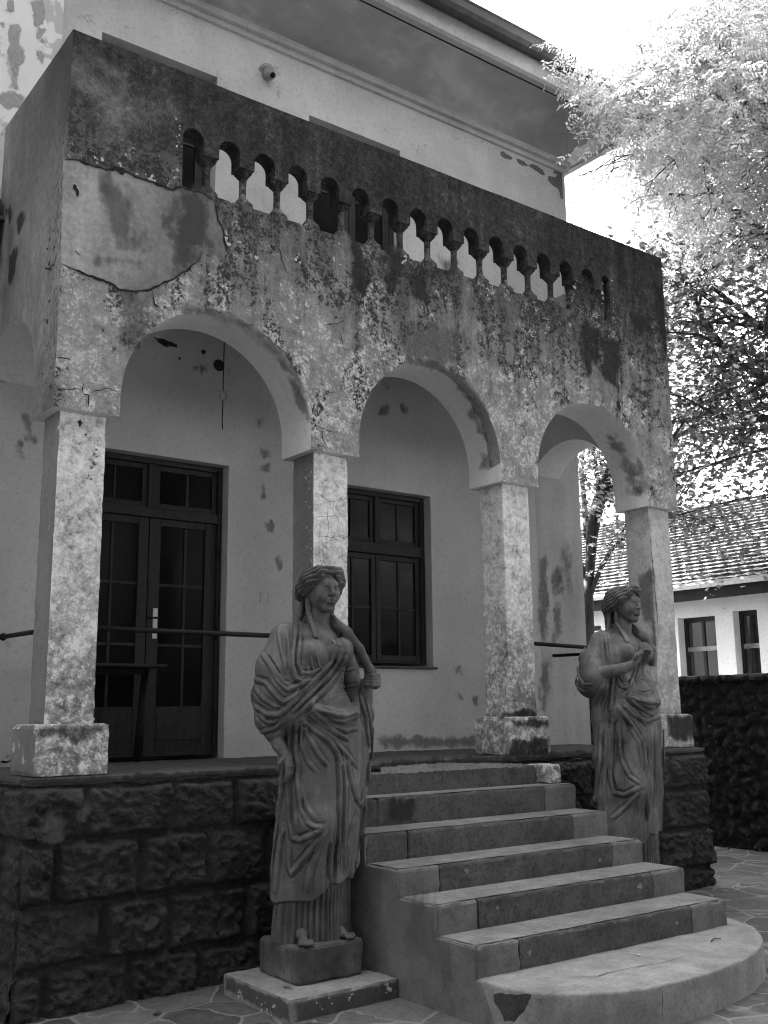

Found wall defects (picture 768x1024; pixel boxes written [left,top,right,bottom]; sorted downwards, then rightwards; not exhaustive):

peeling [0,0,24,109]
peeling [32,1,45,63]
crack [66,159,228,253]
damp [163,194,210,267]
spalling [500,151,563,199]
crack [45,253,201,308]
damp [630,282,670,353]
damp [581,322,622,385]
crack [56,384,118,409]
crack [319,494,347,565]
damp [382,708,592,767]
spalling [493,993,531,1022]